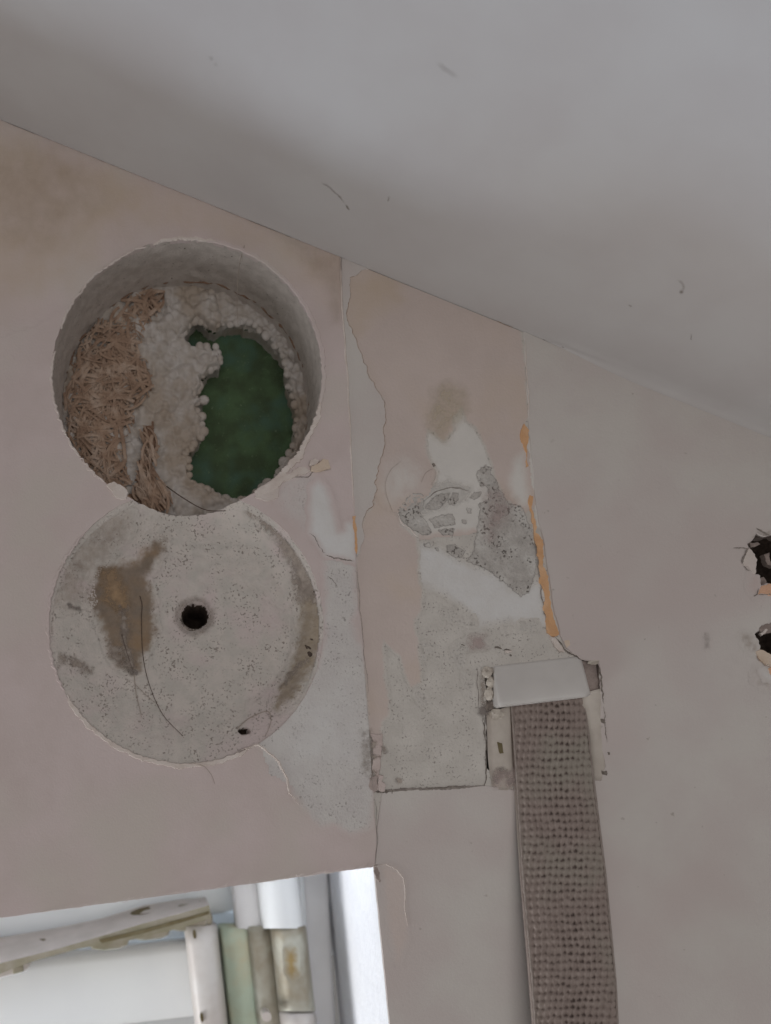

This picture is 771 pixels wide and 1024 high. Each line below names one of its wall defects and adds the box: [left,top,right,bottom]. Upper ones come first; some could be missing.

damp [51,507,171,680]
peeling [237,516,402,840]
spalling [398,466,570,648]
spalling [735,623,771,695]
spalling [736,528,771,602]